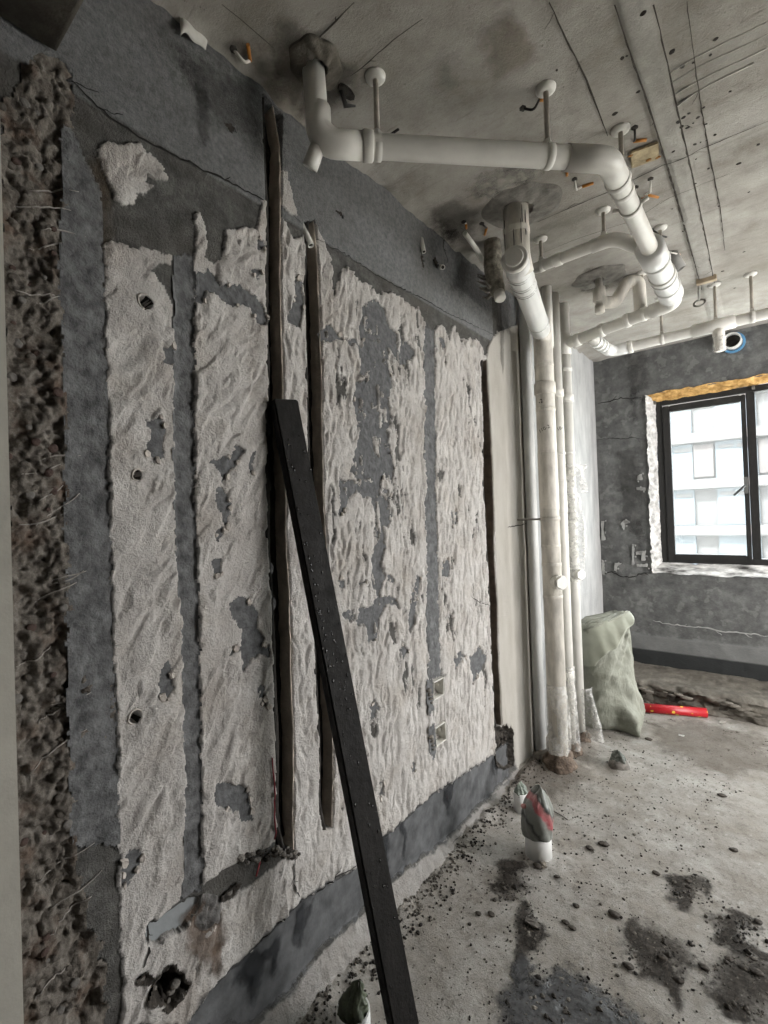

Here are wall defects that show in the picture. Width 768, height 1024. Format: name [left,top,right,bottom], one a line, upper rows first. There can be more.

water stain [473,168,534,196]
spalling [144,414,168,465]
spalling [209,446,256,542]
spalling [317,300,422,643]
spalling [211,558,224,579]
spalling [442,557,452,580]
spalling [229,596,270,671]
spalling [454,645,487,685]
spalling [426,678,436,760]
spalling [494,724,514,770]
corrosion [185,905,225,974]
spalling [137,964,192,1015]